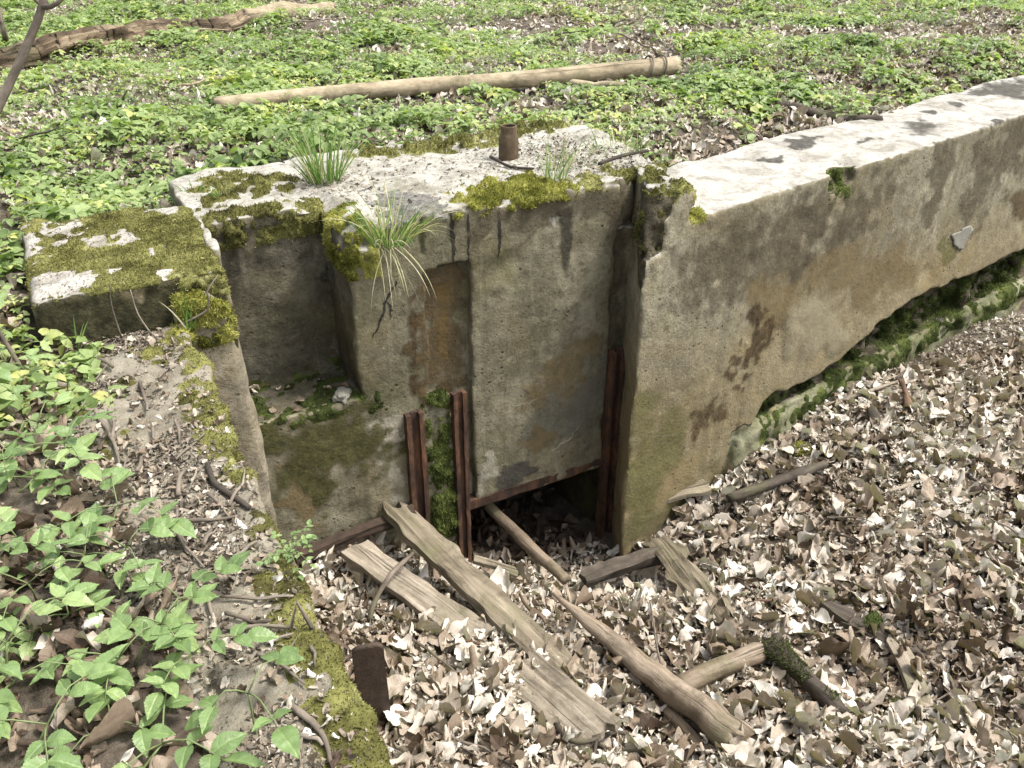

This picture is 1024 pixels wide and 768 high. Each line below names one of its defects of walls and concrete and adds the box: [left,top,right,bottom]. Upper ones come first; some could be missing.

corrosion [403,262,468,405]
leakage [469,180,624,348]
spalling [631,181,687,290]